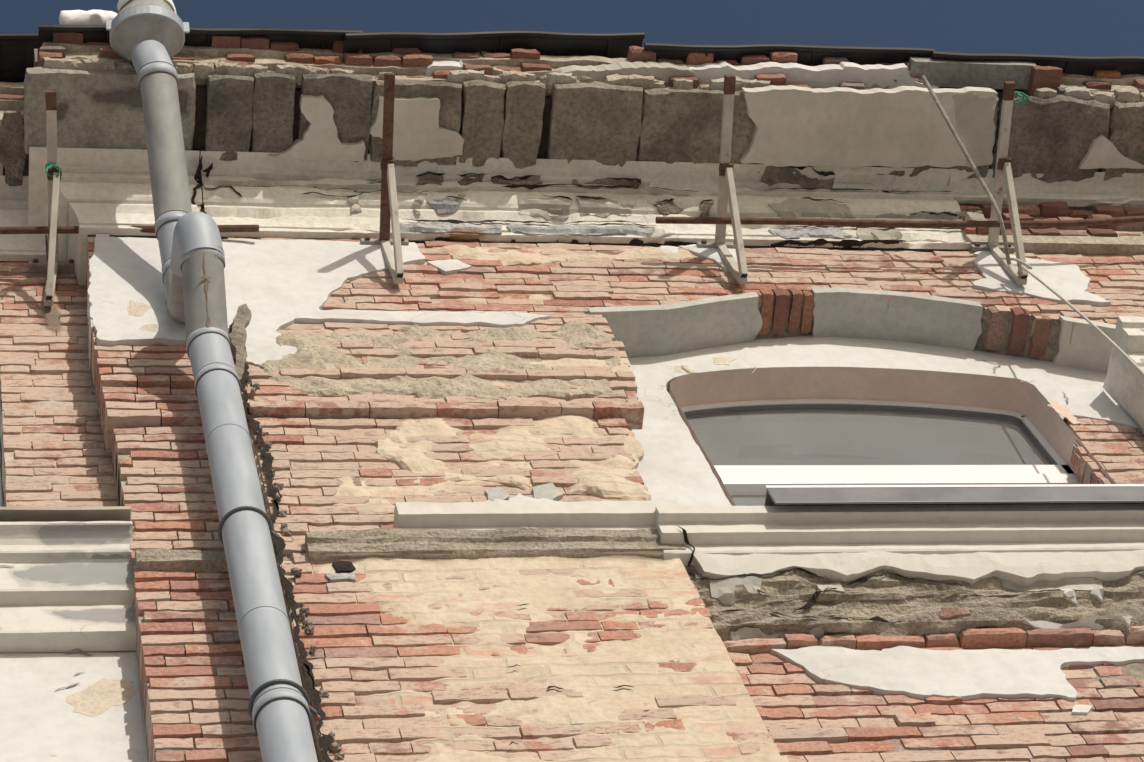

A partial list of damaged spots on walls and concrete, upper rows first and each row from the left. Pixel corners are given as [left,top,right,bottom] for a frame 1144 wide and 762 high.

spalling [0,111,26,179]
peeling [1078,135,1144,169]
peeling [221,94,737,401]
peeling [87,234,186,374]
peeling [1047,391,1081,425]
spalling [332,415,652,514]
spalling [135,549,228,572]
crack [229,304,344,762]
spalling [305,527,1144,715]
crack [678,526,963,623]
peeling [55,672,136,717]